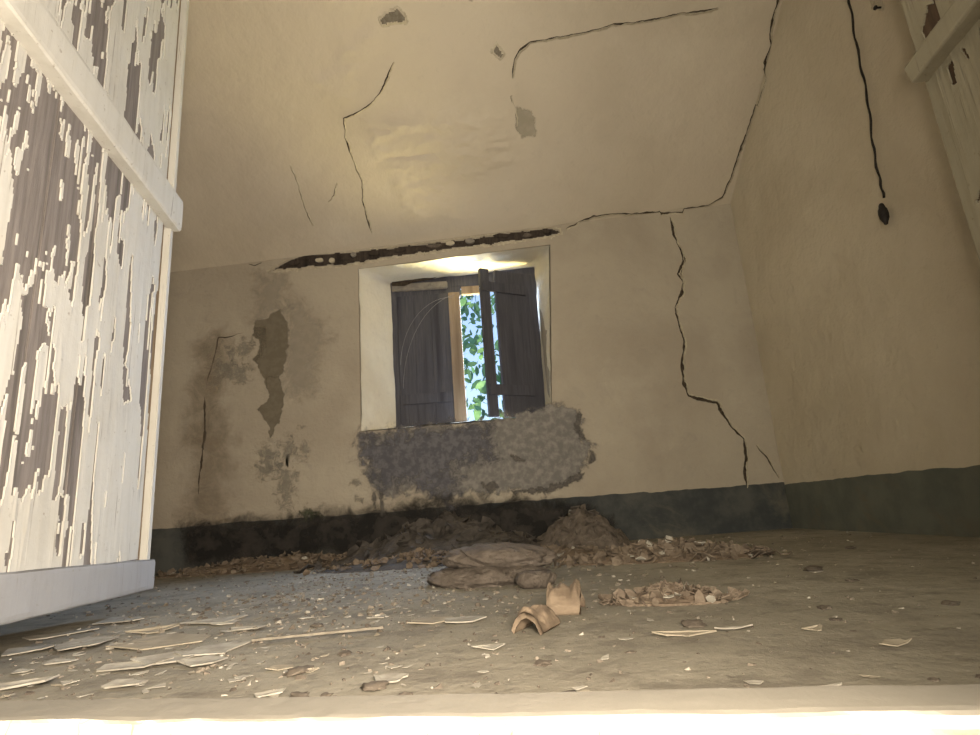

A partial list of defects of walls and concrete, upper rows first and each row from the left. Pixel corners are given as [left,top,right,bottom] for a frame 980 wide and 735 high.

peeling [42,0,180,179]
crack [290,62,395,233]
crack [510,8,718,126]
peeling [900,0,954,52]
peeling [925,19,980,261]
peeling [0,18,163,573]
crack [566,0,781,488]
flaking render [359,403,596,501]